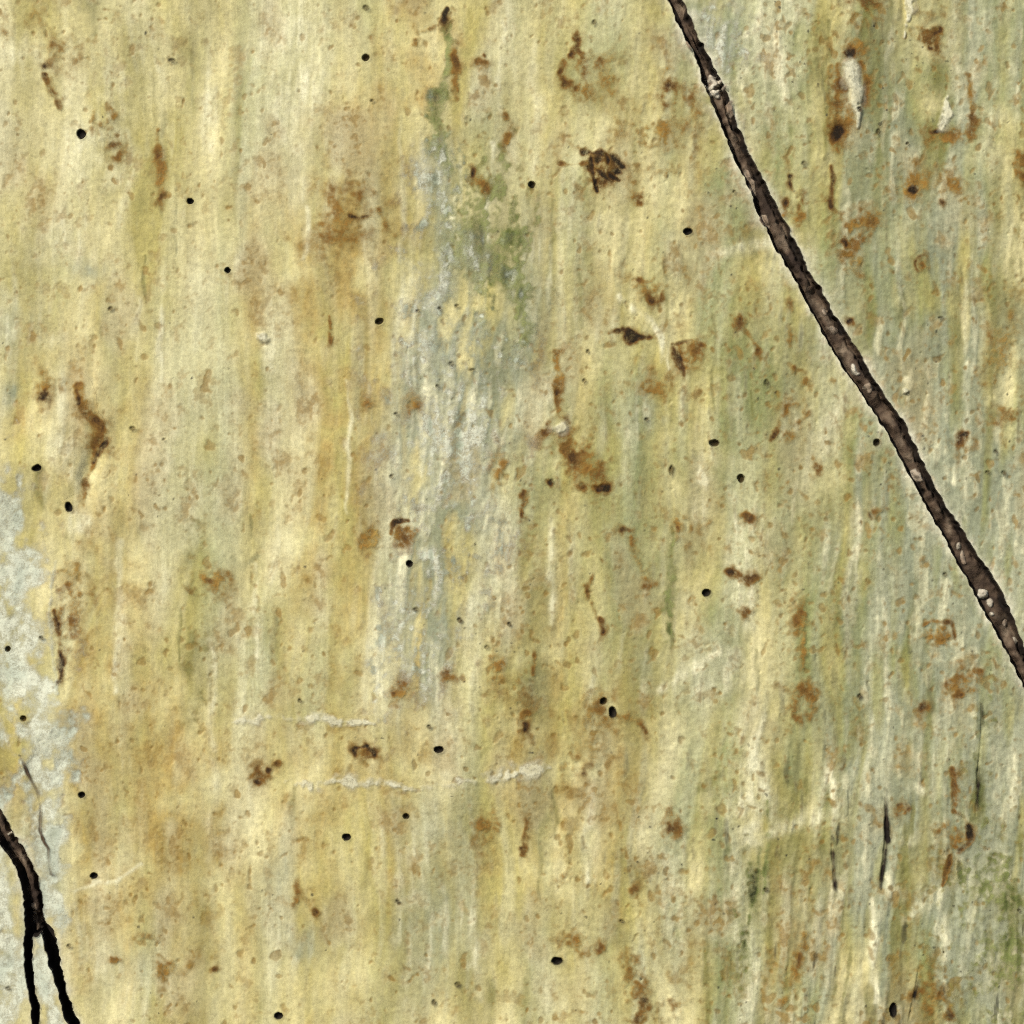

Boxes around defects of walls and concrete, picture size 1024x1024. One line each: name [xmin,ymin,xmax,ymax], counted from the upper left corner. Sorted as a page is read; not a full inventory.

water stain [414,23,459,228]
corrosion [579,149,643,206]
corrosion [827,38,871,153]
water stain [403,244,453,315]
water stain [494,201,535,363]
corrosion [608,327,652,345]
crack [668,0,1024,688]
corrosion [73,381,109,499]
water stain [400,331,500,530]
corrosion [541,349,612,493]
water stain [375,549,458,700]
crack [0,809,80,1024]